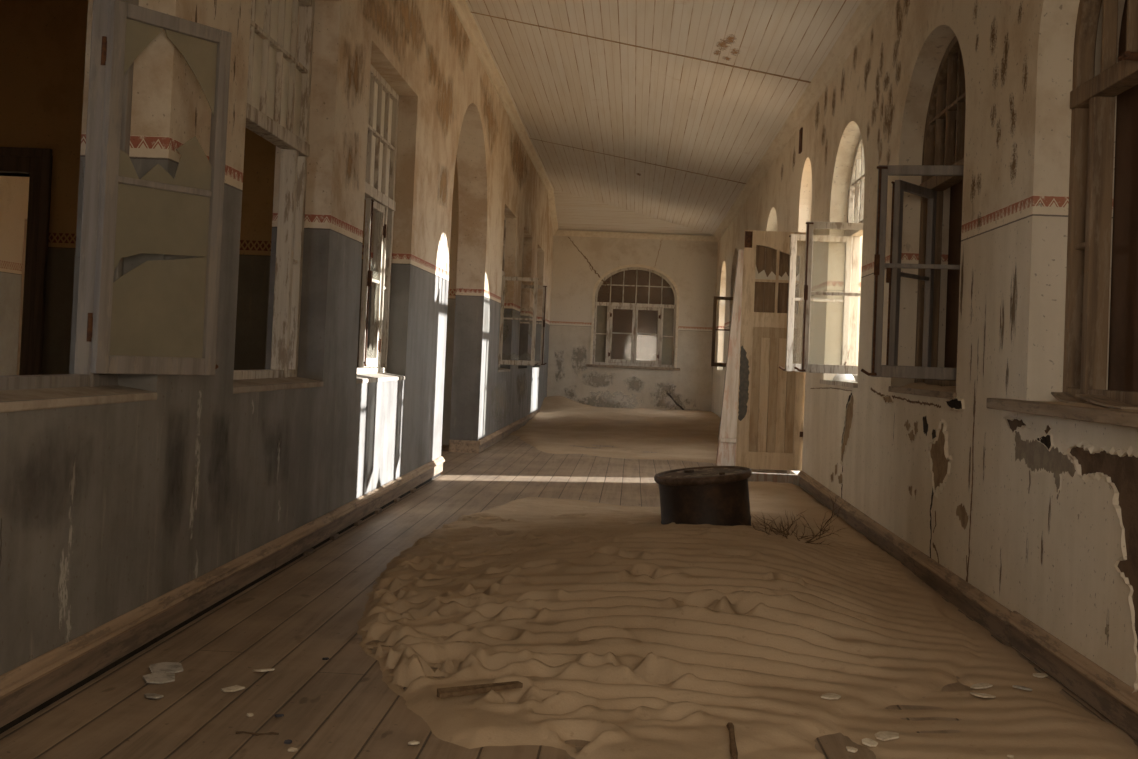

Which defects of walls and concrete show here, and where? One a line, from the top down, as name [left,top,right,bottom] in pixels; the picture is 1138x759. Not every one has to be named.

water stain [815,0,910,165]
water stain [555,348,642,408]
spalling [830,393,856,498]
spalling [871,387,965,563]
spalling [1004,416,1138,693]